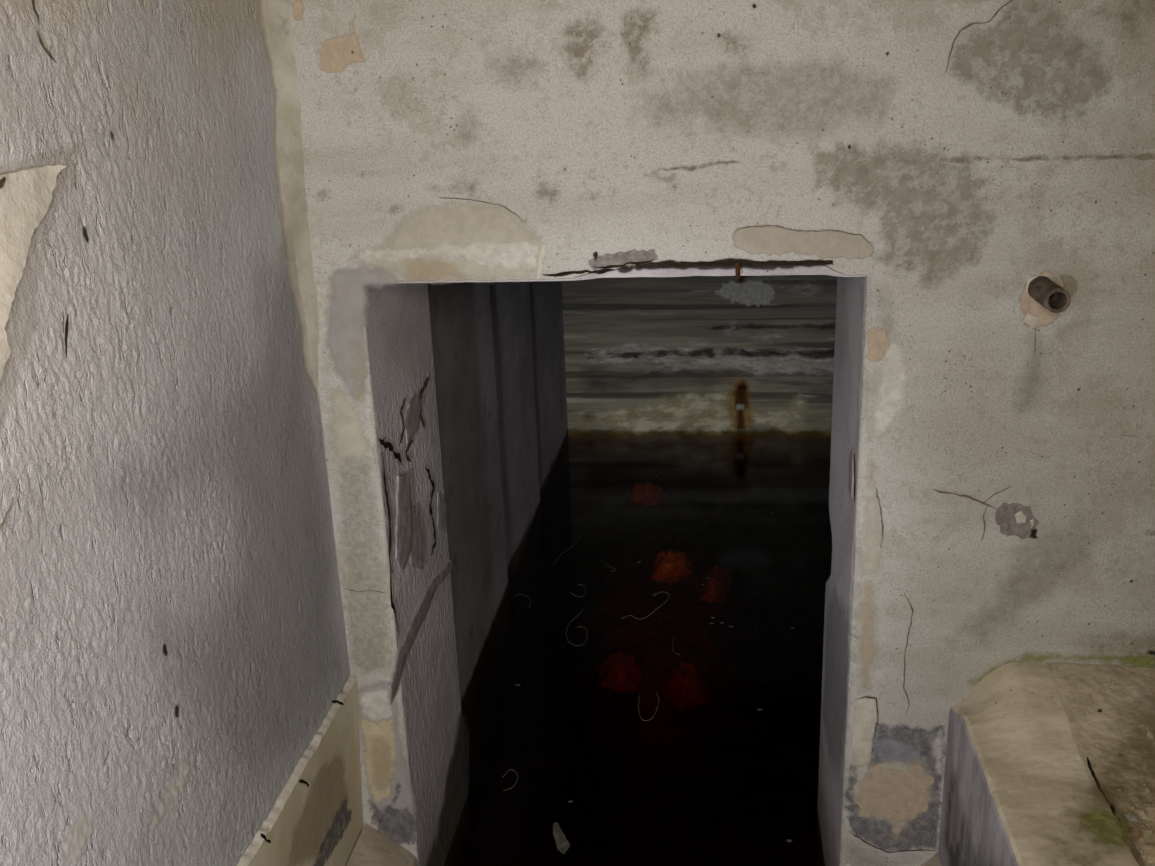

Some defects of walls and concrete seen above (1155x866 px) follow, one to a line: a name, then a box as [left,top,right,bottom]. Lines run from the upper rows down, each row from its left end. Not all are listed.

crack [1019,153,1151,161]
spalling [1020,271,1065,329]
corrosion [731,381,749,429]
spalling [867,327,908,434]
peeling [846,696,945,853]